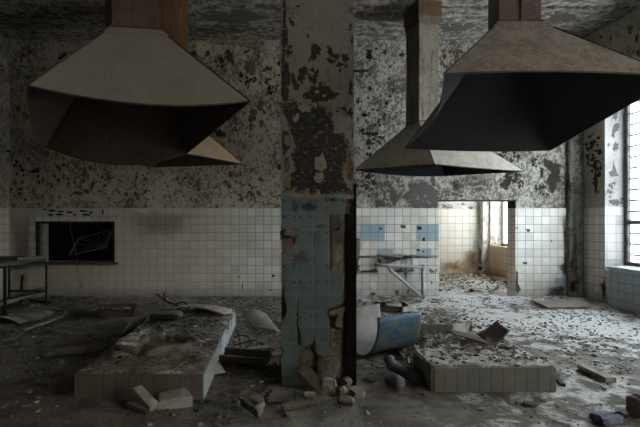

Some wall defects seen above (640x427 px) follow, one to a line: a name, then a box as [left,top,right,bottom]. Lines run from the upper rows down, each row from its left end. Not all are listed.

peeling [214,0,490,209]
peeling [13,158,111,201]
peeling [499,172,524,191]
peeling [531,156,562,196]
peeling [585,112,623,206]
spalling [280,225,301,255]
damp [563,188,577,292]
crack [296,300,317,353]
spalling [328,214,346,386]